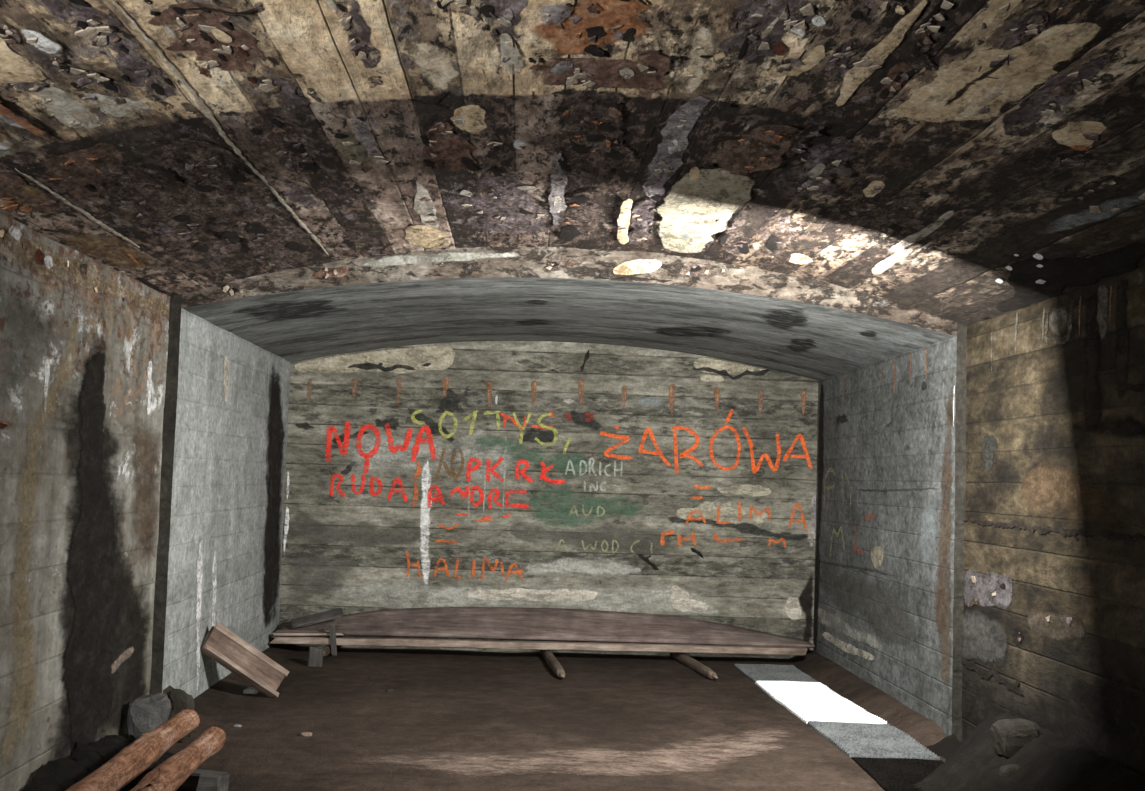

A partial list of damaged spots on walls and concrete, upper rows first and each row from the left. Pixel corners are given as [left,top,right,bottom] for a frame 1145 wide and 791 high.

spalling [0,0,203,129]
spalling [325,0,383,88]
spalling [45,0,325,262]
peeling [334,118,389,167]
peeling [405,0,1130,279]
spalling [0,173,59,214]
spalling [311,266,349,279]
water stain [0,293,149,761]
water stain [965,678,1145,778]